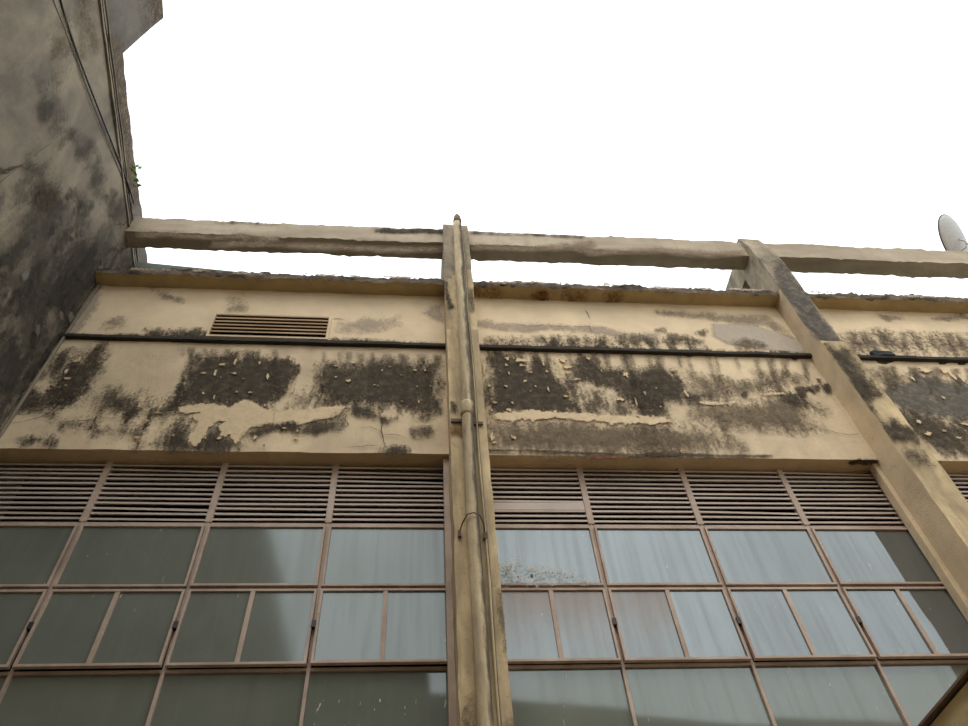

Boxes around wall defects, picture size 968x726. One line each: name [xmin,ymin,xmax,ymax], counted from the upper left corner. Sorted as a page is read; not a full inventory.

leakage [0,0,446,455]
crack [343,415,427,449]
leakage [479,328,832,458]
leakage [772,258,968,466]